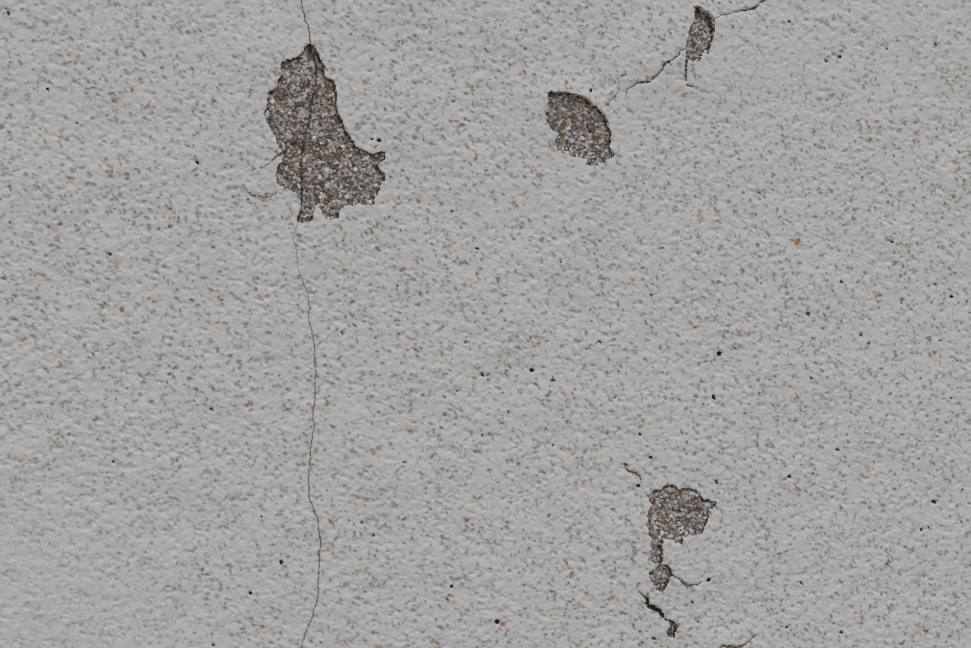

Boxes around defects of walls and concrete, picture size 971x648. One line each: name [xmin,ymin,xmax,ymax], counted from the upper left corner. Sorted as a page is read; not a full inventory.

spalling [685,7,715,62]
crack [717,0,764,18]
crack [606,49,693,105]
spalling [264,44,386,224]
spalling [546,91,614,166]
crack [293,227,322,648]
spalling [646,485,717,592]
crack [638,591,667,621]